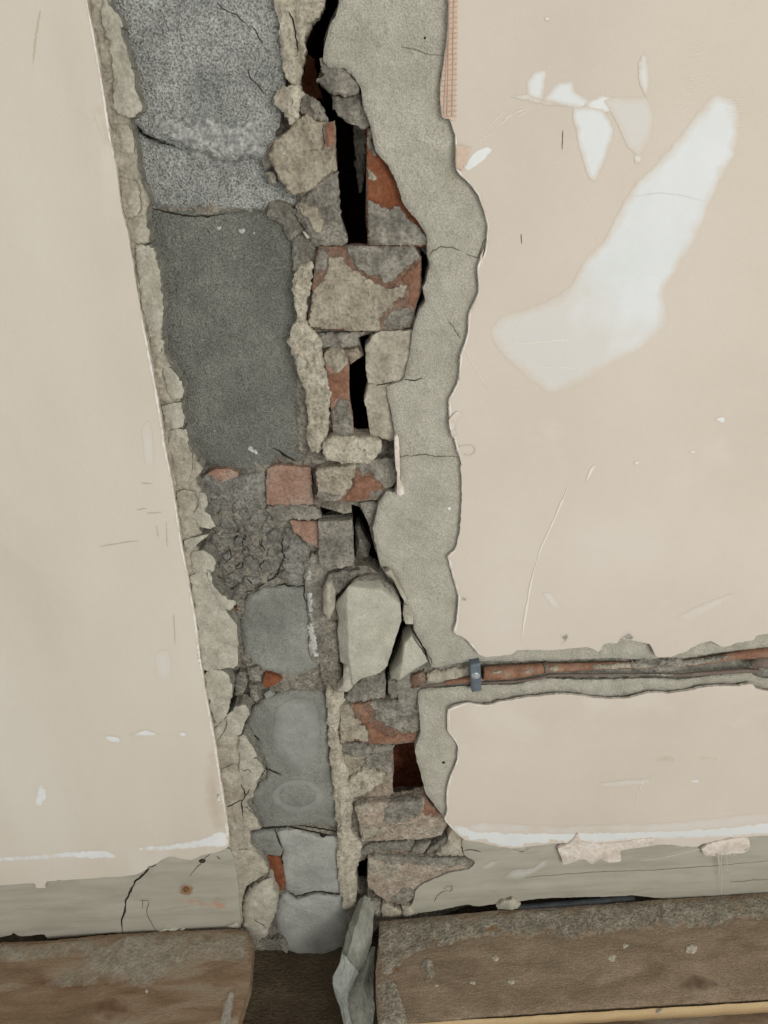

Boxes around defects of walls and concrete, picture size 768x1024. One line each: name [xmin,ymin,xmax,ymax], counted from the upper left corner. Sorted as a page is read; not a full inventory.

flaking render [323,0,768,680]
flaking render [86,0,311,914]
crack [224,520,307,604]
peeling [337,664,353,692]
flaking render [393,673,768,854]
crack [121,865,156,934]
peeling [557,832,764,897]